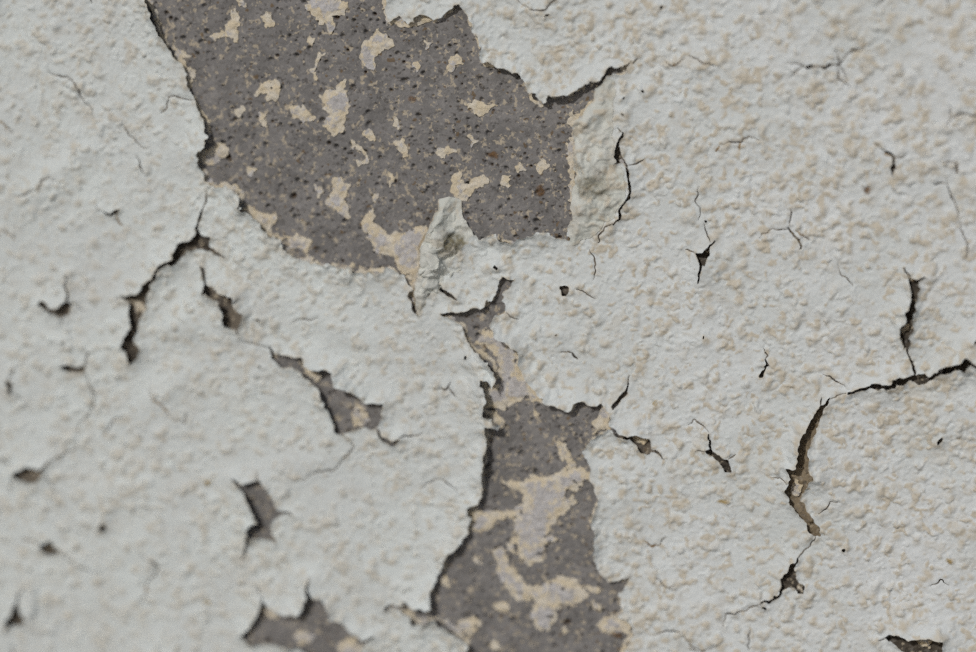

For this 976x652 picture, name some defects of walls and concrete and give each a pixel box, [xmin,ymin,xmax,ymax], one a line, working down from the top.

crack [37,275,84,325]
peeling [144,0,638,317]
crack [589,128,644,281]
crack [685,188,715,284]
peeling [383,265,633,652]
crack [614,377,629,407]
crack [613,433,664,460]
crack [654,267,976,652]